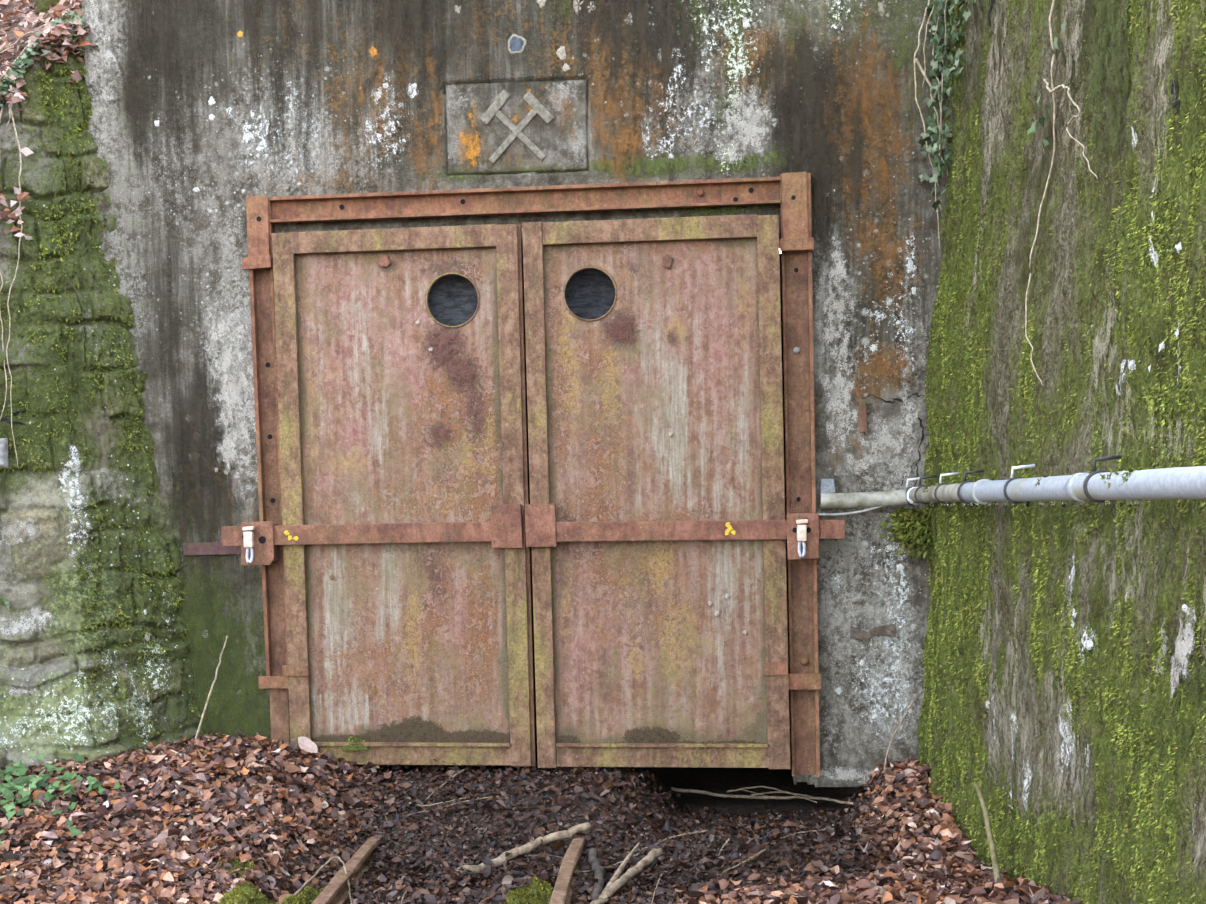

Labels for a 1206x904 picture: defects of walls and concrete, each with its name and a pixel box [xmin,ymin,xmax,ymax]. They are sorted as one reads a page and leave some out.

leakage [120,0,213,183]
leakage [237,0,323,172]
leakage [337,0,490,162]
leakage [556,0,878,362]
leakage [873,233,921,377]
leakage [160,308,239,667]